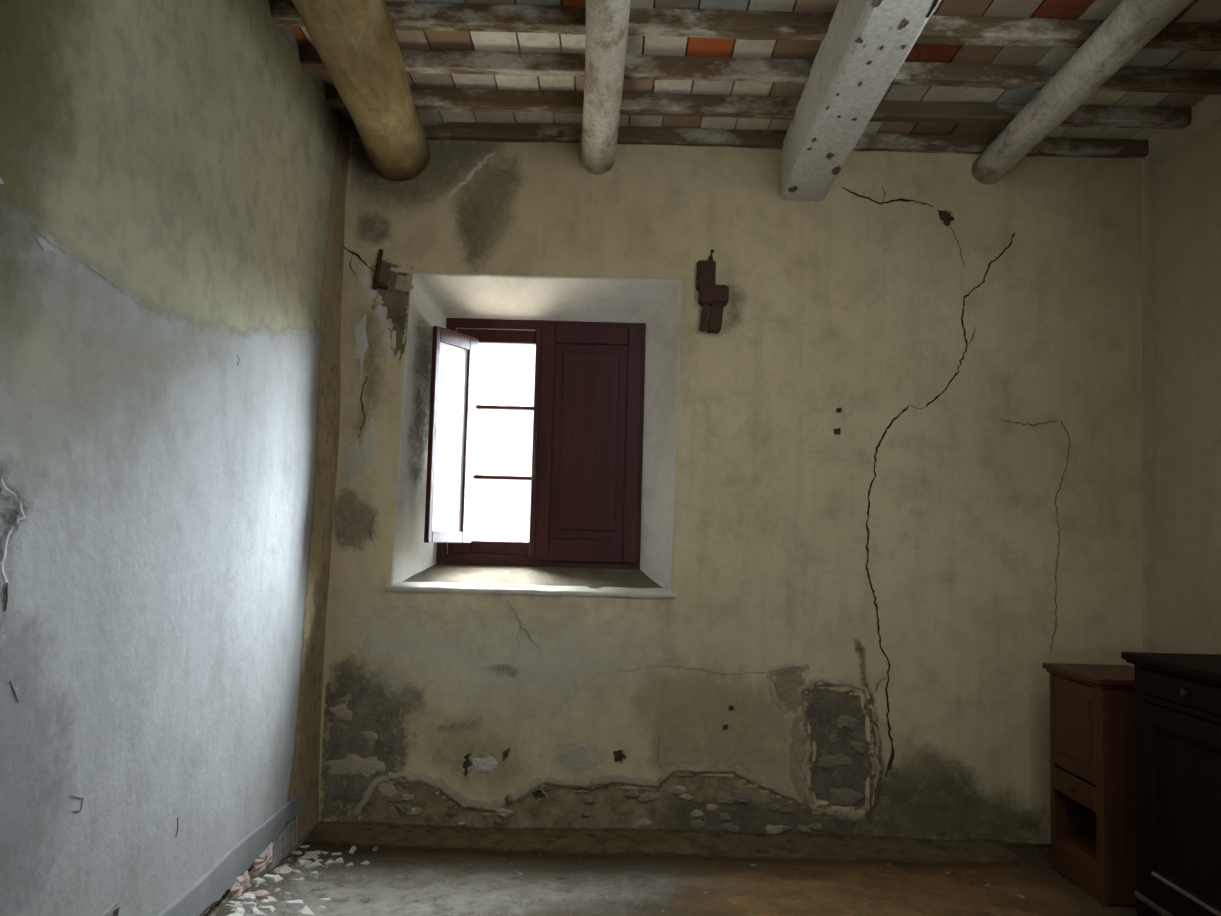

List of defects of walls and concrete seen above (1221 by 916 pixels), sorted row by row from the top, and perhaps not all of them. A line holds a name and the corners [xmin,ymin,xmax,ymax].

peeling [0,459,28,611]
water stain [0,0,627,843]
crack [842,187,1015,777]
crack [1002,419,1071,651]
flaking render [351,662,882,834]
flaking render [200,816,299,916]